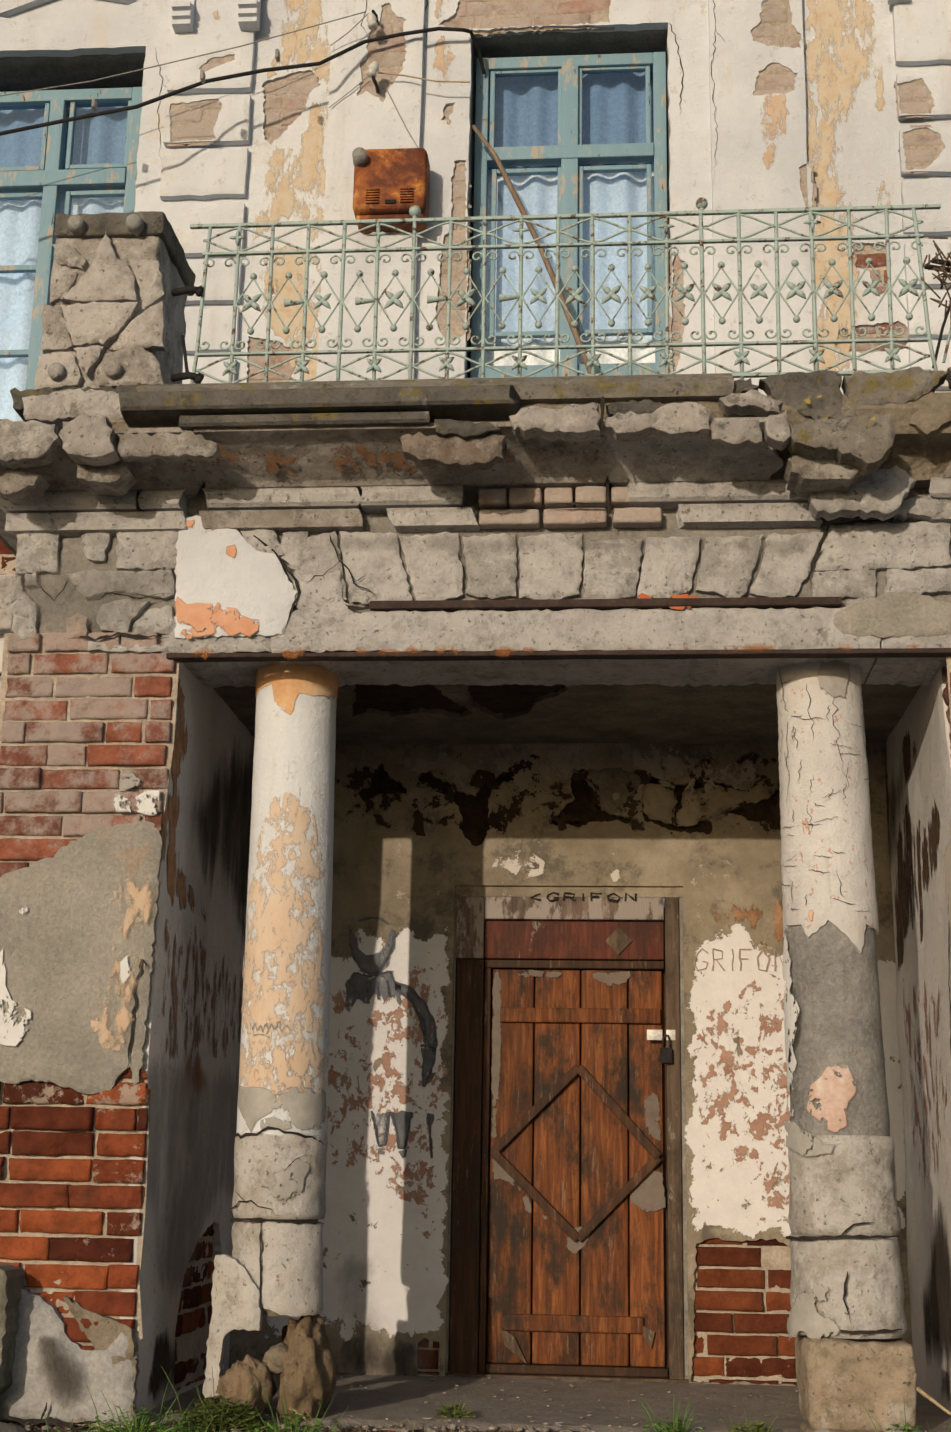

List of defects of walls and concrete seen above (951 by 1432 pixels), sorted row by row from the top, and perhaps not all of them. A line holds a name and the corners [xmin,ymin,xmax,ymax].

spalling [0,0,951,522]
peeling [175,597,259,639]
crack [253,534,377,634]
flaking render [0,631,449,1239]
flaking render [0,1068,151,1426]
flaking render [691,976,797,1386]